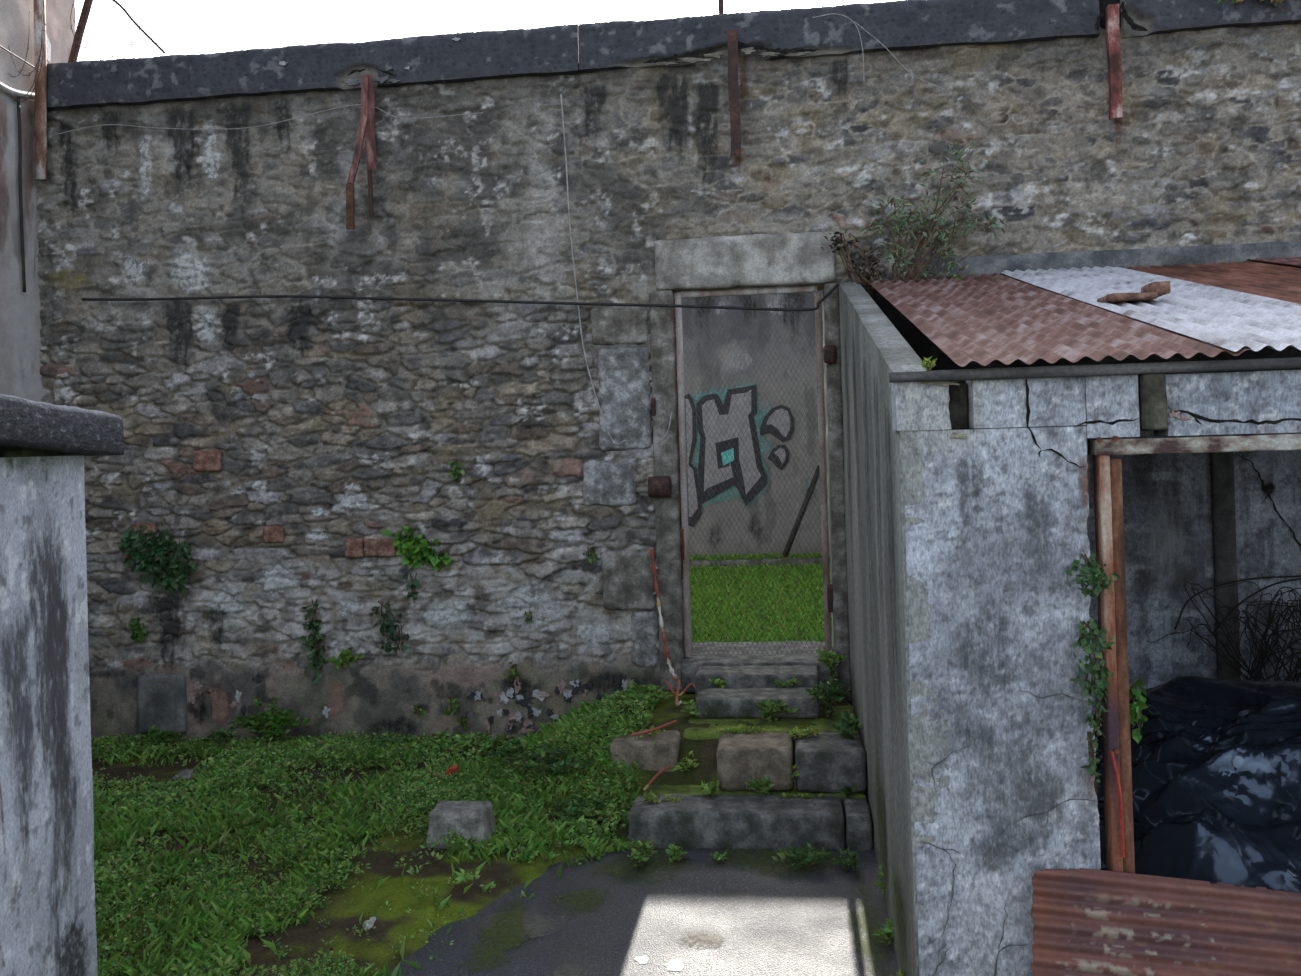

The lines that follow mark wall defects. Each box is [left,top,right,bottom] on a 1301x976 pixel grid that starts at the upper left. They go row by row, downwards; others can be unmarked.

damp [59,121,77,210]
efflorescence [139,135,153,200]
damp [167,103,250,196]
efflorescence [122,256,146,285]
damp [166,250,240,365]
crack [1025,378,1138,468]
crack [1168,407,1301,548]
damp [2,530,87,976]
crack [925,745,971,788]
crack [1000,799,1093,836]
crack [924,842,959,976]
crack [994,903,1028,976]